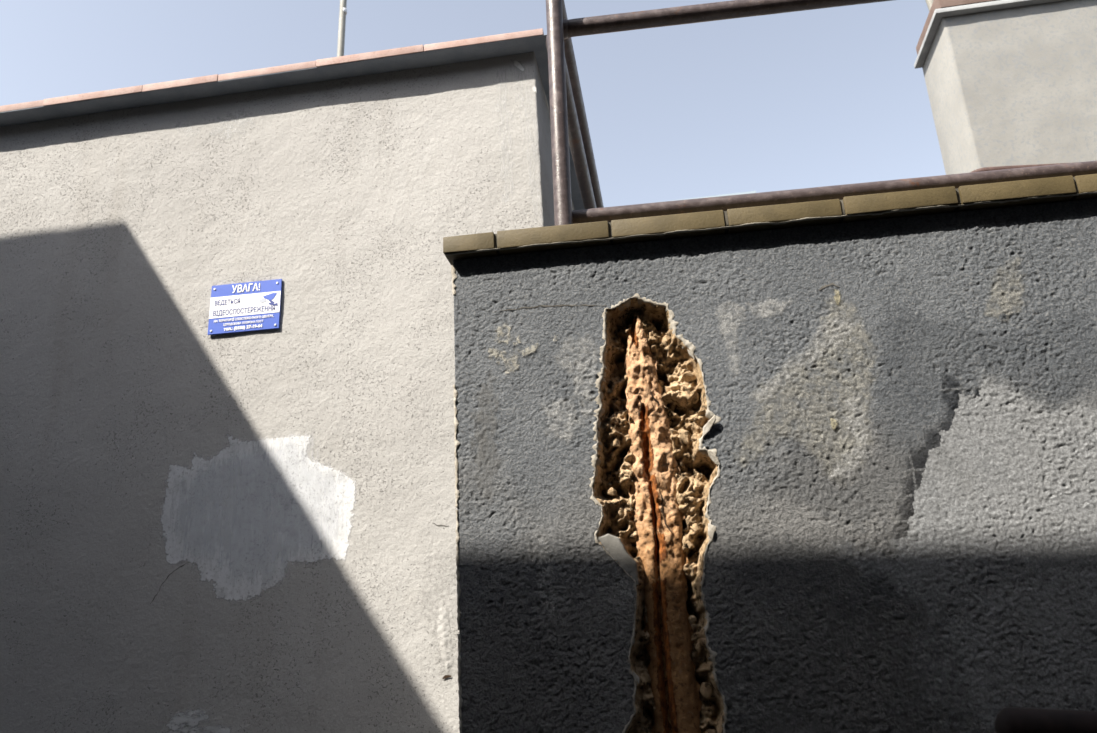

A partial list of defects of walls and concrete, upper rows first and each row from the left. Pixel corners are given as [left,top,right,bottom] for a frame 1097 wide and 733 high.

rust [638,403,667,566]
spalling [589,293,728,733]